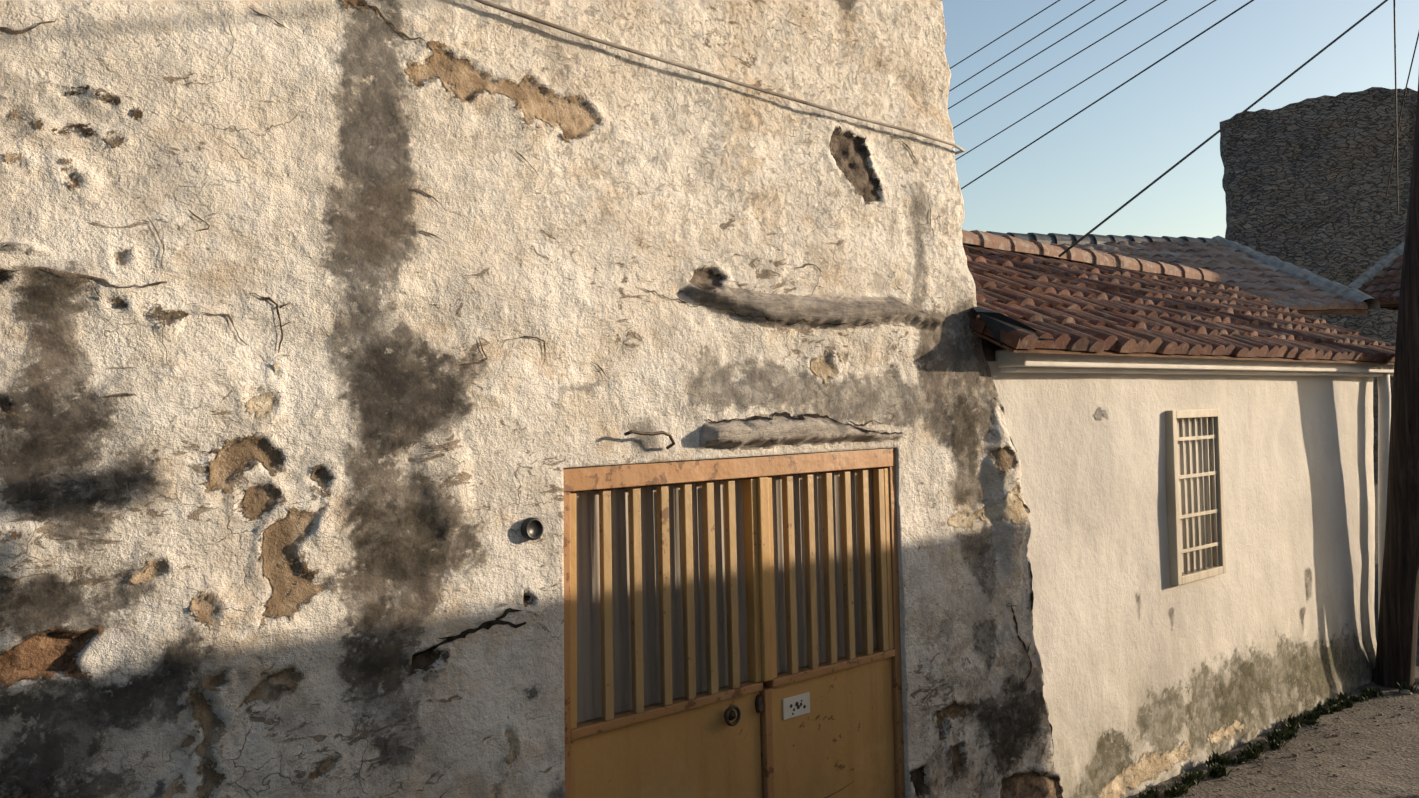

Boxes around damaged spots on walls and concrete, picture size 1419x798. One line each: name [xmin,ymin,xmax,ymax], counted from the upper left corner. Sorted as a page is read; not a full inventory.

peeling [342,0,372,12]
peeling [404,41,604,143]
peeling [829,126,884,204]
damp [0,260,164,555]
damp [321,4,489,781]
damp [683,299,999,511]
peeling [206,392,338,629]
crack [413,608,526,659]
damp [1300,568,1312,626]
damp [0,626,217,798]
damp [1209,656,1271,736]
flaking render [1000,768,1063,798]